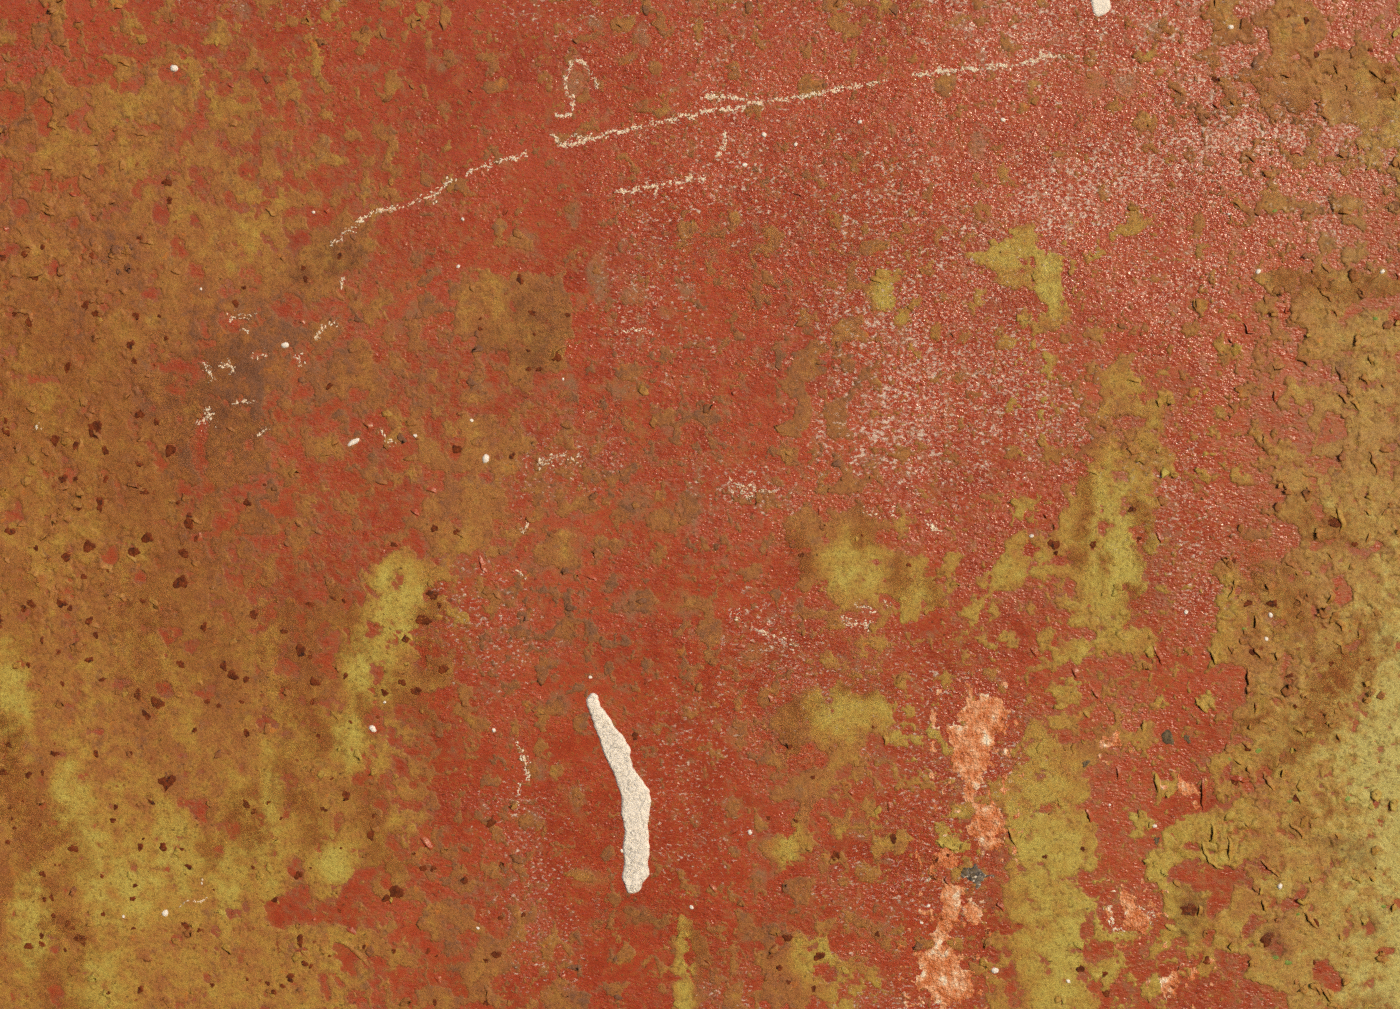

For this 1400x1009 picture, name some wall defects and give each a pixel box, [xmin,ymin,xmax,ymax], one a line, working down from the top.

peeling [0,0,735,1009]